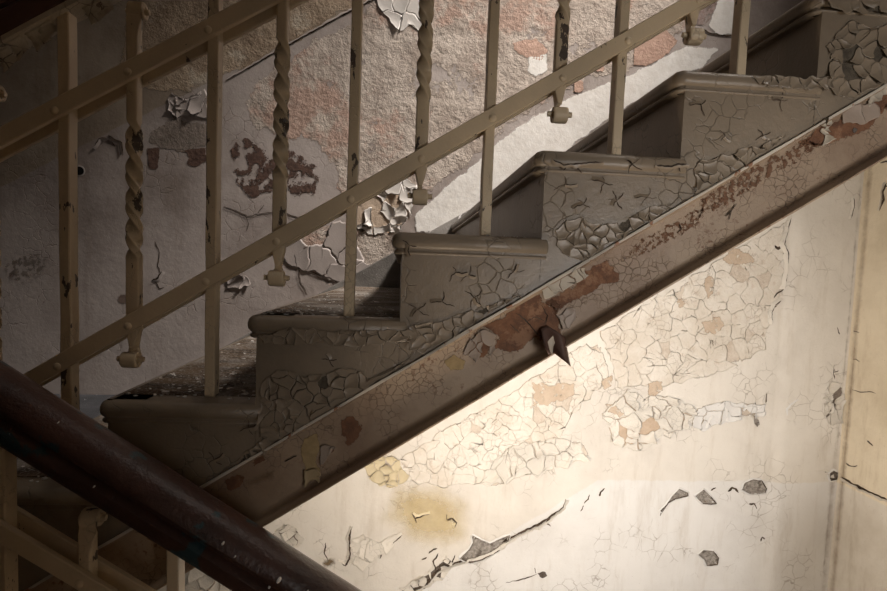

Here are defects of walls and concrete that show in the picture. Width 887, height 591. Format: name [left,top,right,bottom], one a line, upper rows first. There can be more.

peeling [356,135,483,273]
flaking render [358,0,489,184]
peeling [492,62,612,190]
flaking render [496,0,616,105]
crack [551,157,690,209]
peeling [624,20,718,109]
corrosion [629,95,887,256]
crack [877,161,887,211]
peeling [365,223,784,488]
crack [378,511,457,559]
crack [414,488,605,591]
crack [840,463,887,502]